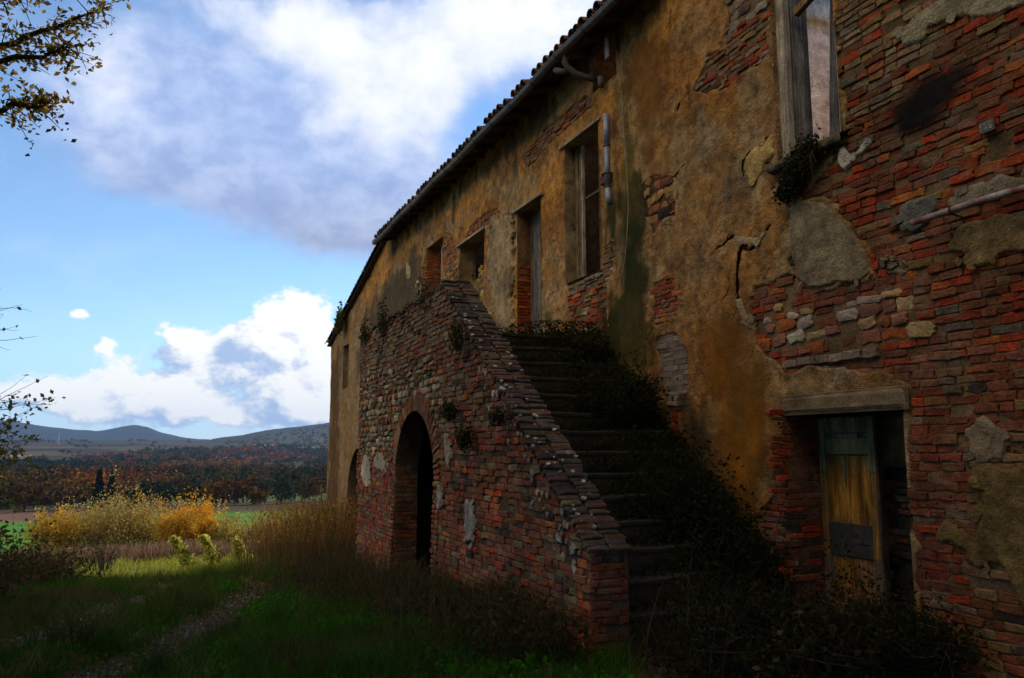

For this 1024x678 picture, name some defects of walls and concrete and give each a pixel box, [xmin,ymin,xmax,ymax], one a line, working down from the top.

spalling [687,0,776,95]
spalling [523,90,594,169]
spalling [639,175,679,236]
spalling [567,244,616,336]
crack [700,224,771,322]
spalling [648,274,691,461]
spalling [752,0,1024,678]